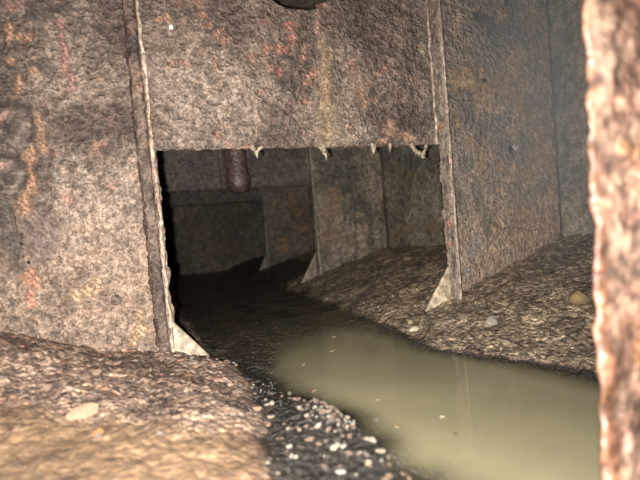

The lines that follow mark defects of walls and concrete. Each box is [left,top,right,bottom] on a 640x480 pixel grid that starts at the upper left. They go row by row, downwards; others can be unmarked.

corrosion [4,22,32,43]
corrosion [263,21,297,54]